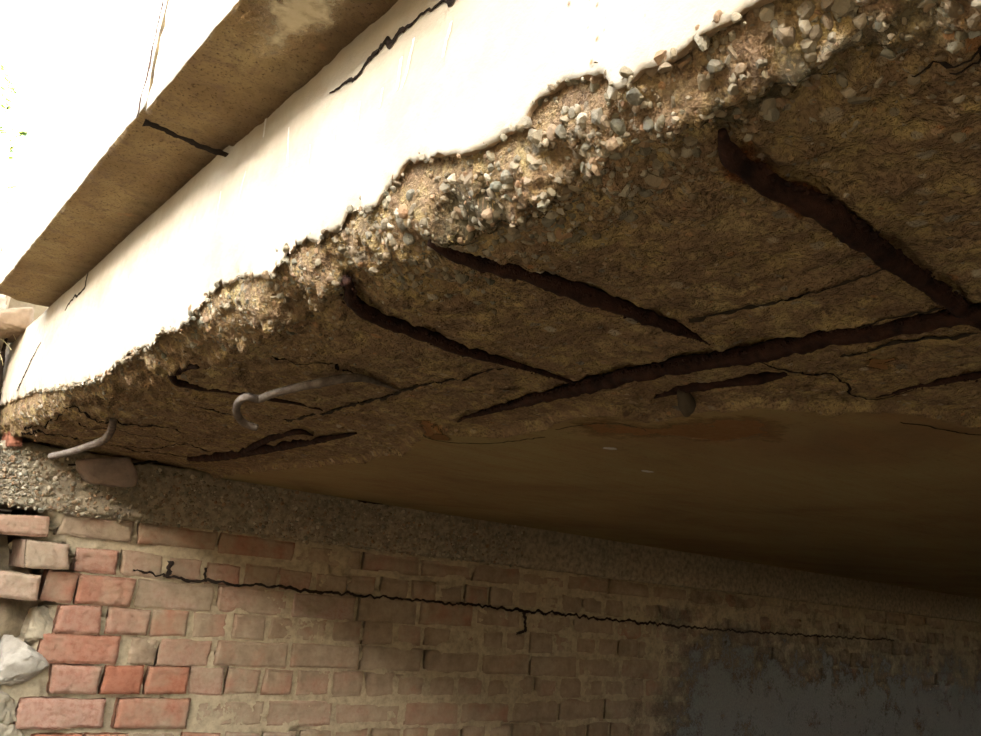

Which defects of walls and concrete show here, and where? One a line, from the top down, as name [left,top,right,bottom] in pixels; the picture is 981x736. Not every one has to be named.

crack [136,0,229,157]
leakage [270,0,331,46]
crack [329,0,455,93]
spalling [0,0,981,479]
crack [133,561,894,641]